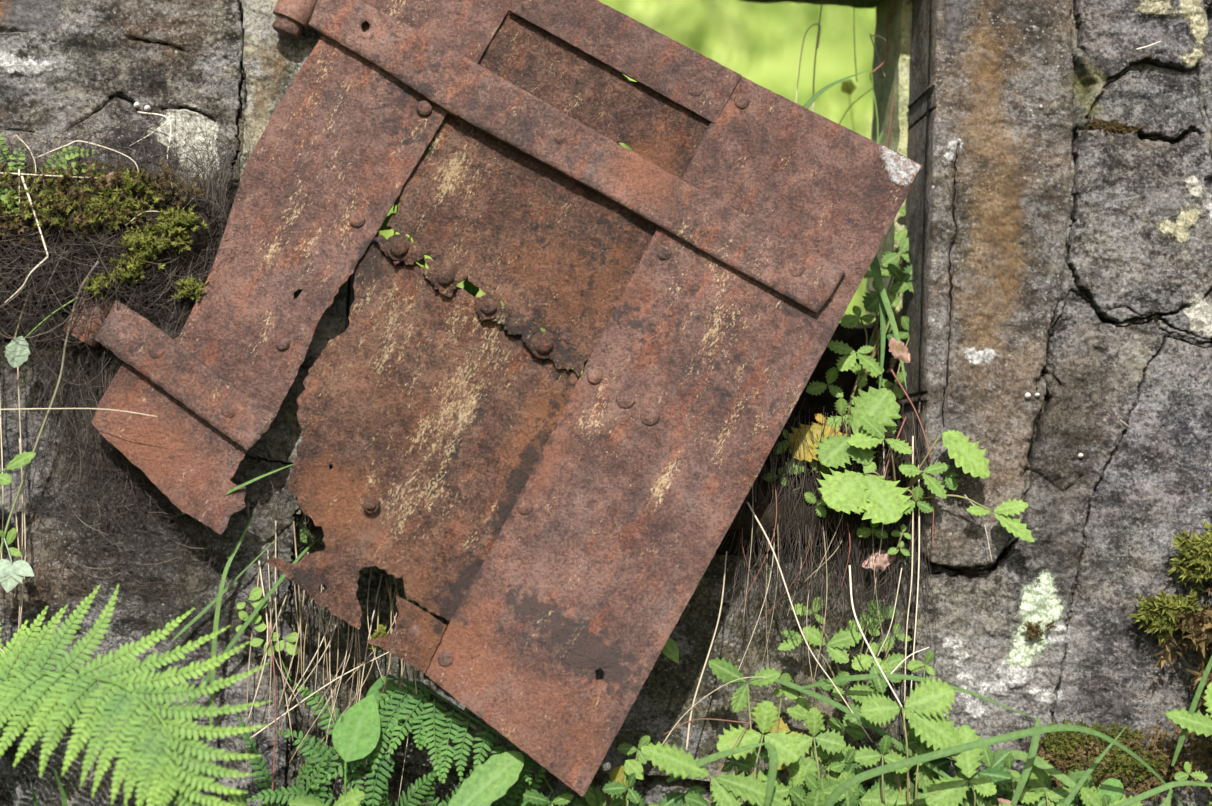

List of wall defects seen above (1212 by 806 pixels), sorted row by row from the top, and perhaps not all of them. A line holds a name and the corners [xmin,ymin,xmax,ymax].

crack [67,95,213,130]
crack [1138,131,1189,145]
crack [942,144,958,427]
crack [1109,305,1212,348]
crack [1021,313,1084,491]